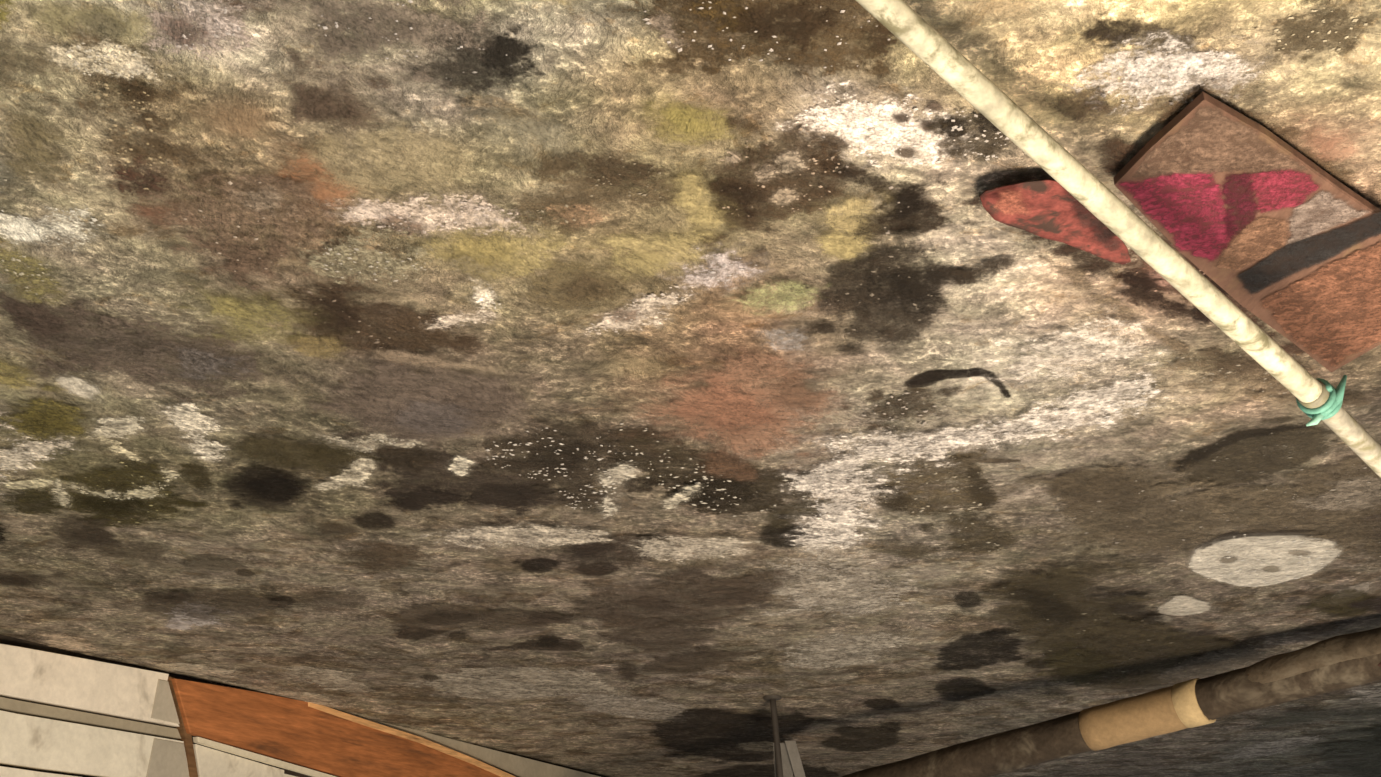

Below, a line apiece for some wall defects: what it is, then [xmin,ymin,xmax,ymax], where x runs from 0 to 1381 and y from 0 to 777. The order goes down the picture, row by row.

leakage [1054,13,1257,122]
leakage [1269,0,1371,60]
leakage [1241,113,1355,191]
leakage [0,0,1161,681]
leakage [1157,349,1296,403]
leakage [927,417,1381,702]
leakage [412,667,901,777]